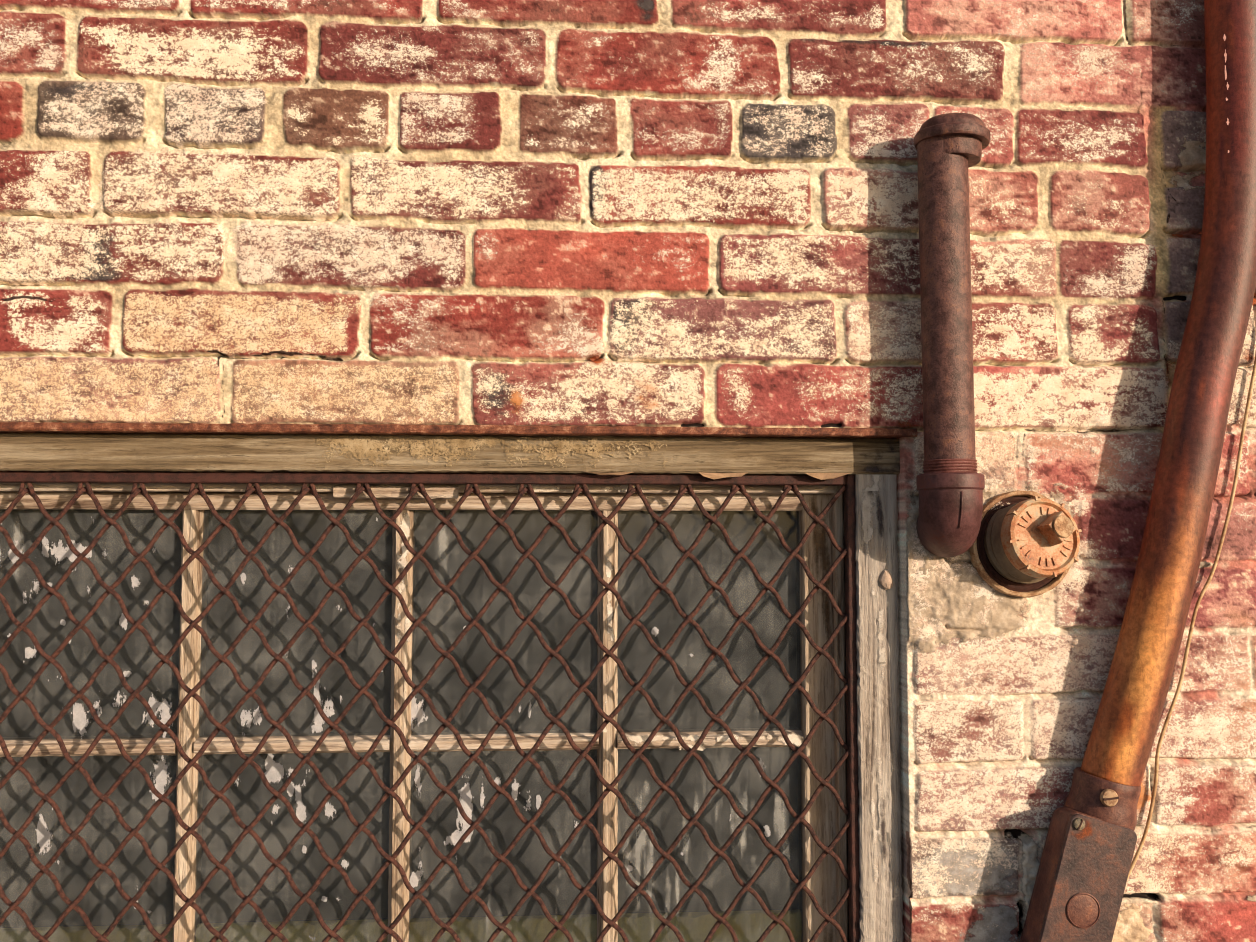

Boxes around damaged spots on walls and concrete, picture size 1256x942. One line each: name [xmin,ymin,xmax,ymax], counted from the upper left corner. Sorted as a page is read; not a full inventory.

crack [209,350,343,417]